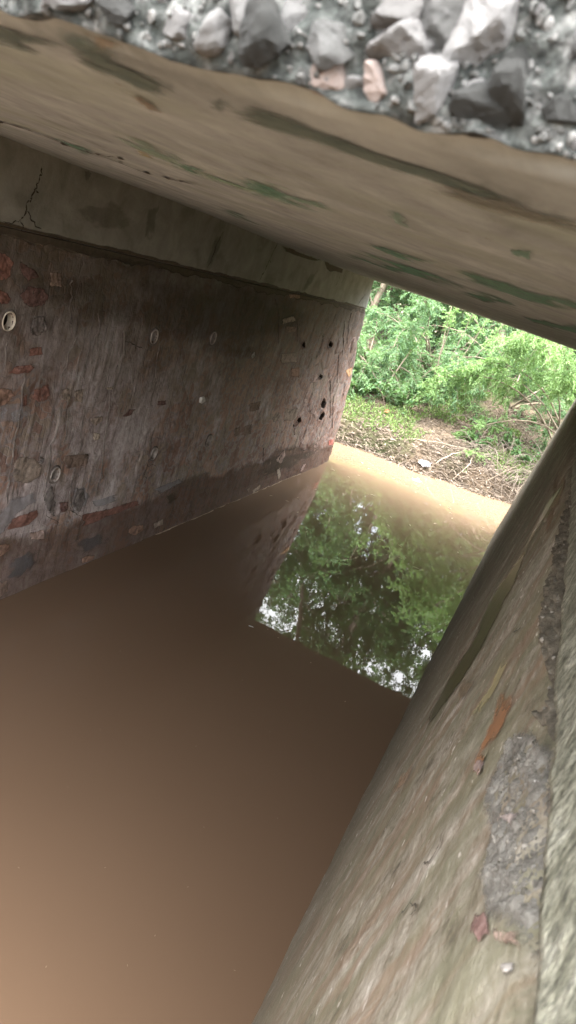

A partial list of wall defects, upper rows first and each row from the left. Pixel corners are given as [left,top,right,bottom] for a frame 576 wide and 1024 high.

crack [5,168,42,231]
damp [238,109,576,230]
rust [474,696,511,771]
spalling [470,484,571,953]